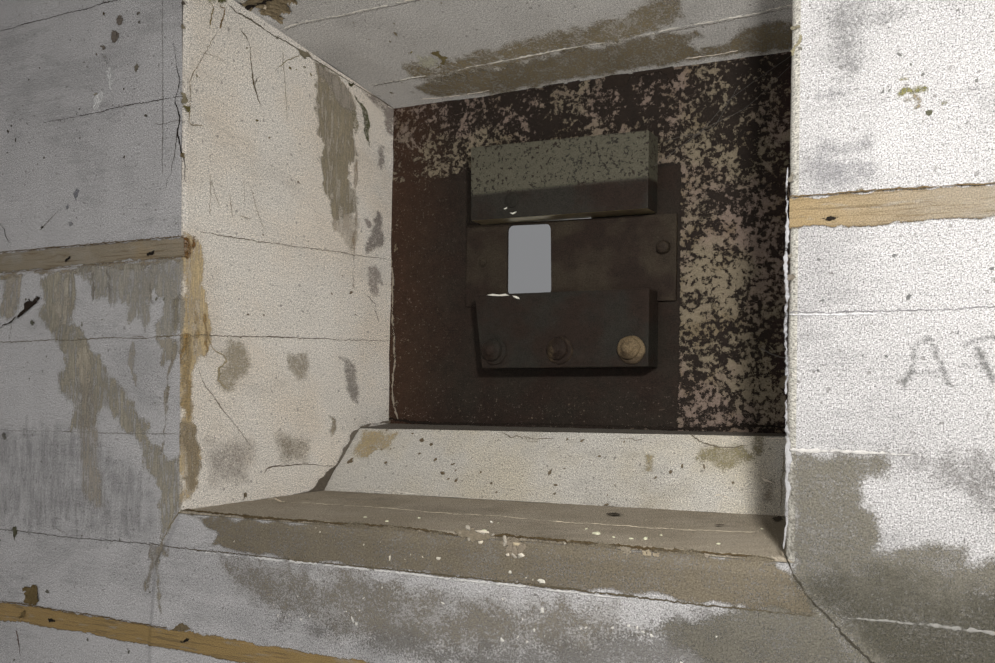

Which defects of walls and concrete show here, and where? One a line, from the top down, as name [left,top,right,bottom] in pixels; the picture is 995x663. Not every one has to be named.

crack [44,0,223,189]
spalling [240,0,298,24]
crack [228,4,394,110]
damp [315,62,358,248]
damp [367,94,394,135]
rust [528,80,580,90]
damp [404,0,792,97]
rust [604,66,675,89]
rust [771,54,792,71]
damp [34,258,995,663]
crack [0,509,458,545]
crack [494,533,875,663]